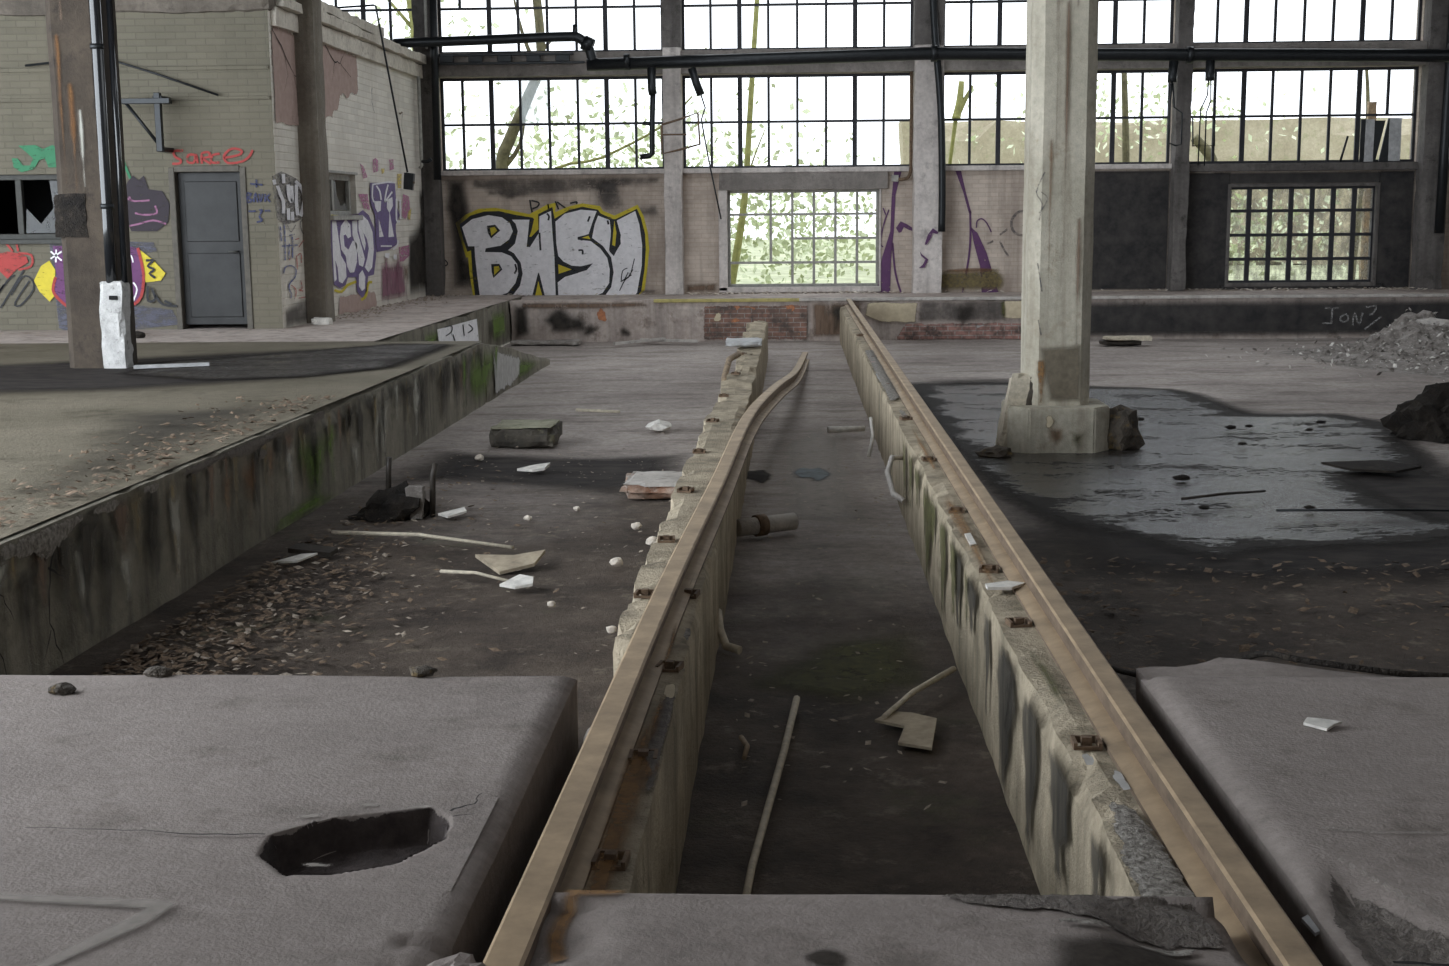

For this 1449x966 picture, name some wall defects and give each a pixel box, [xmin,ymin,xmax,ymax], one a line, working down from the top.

peeling [271,26,299,126]
peeling [323,45,358,121]
spalling [0,499,120,561]
damp [0,349,497,646]
damp [1051,517,1449,579]
damp [1348,462,1449,521]
hole [260,803,449,876]
rust [549,706,661,962]